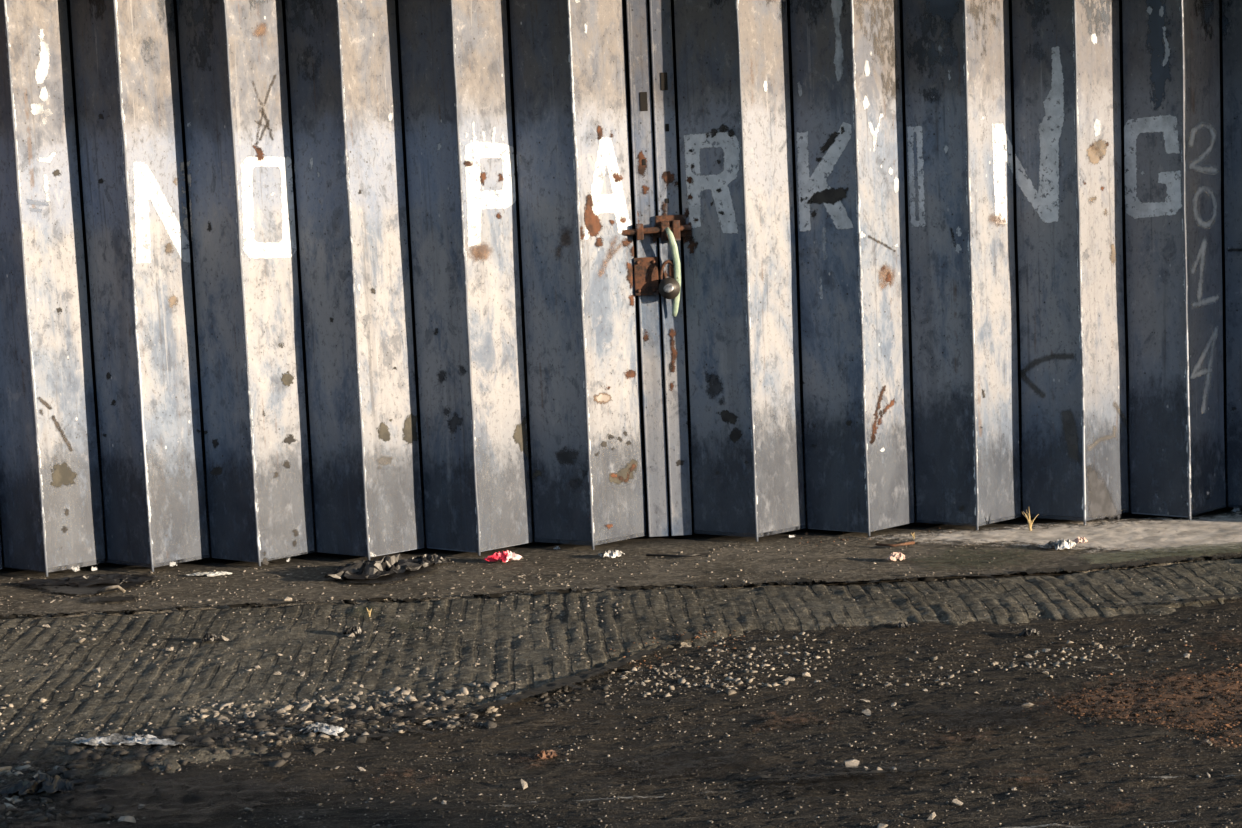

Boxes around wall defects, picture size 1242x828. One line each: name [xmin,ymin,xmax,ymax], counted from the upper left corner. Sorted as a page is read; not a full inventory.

corrosion [472,245,491,259]
corrosion [557,194,640,306]
corrosion [637,150,649,194]
corrosion [662,163,698,253]
peeling [800,187,848,217]
peeling [51,462,77,488]
damp [0,397,646,572]
peeling [356,362,418,493]
peeling [512,416,528,457]
peeling [595,431,638,485]
peeling [705,371,756,463]
damp [691,381,1242,538]